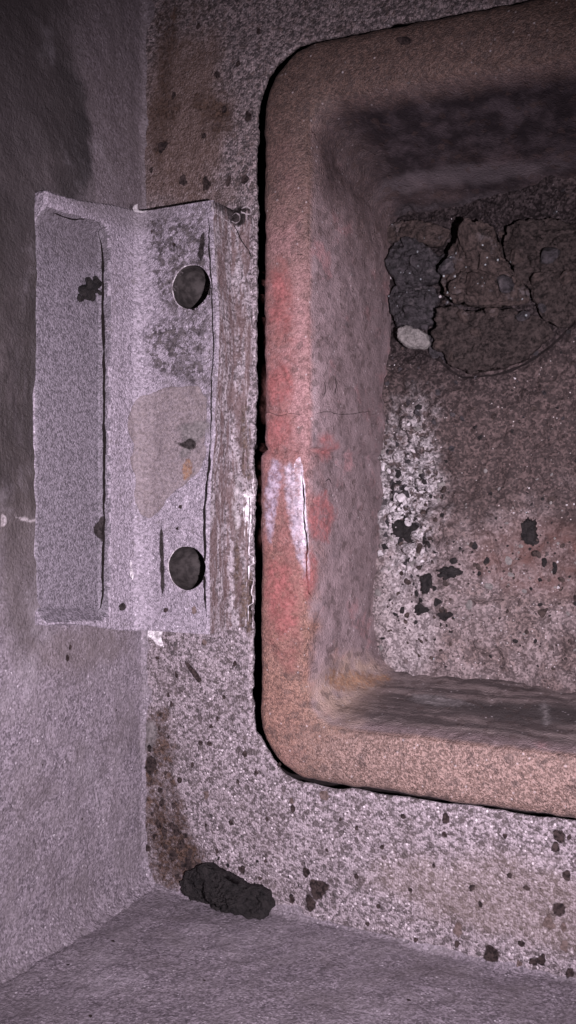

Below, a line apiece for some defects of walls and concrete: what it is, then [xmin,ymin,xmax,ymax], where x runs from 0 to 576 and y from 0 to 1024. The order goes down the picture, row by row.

crack [265,384,368,416]
crack [301,471,332,599]